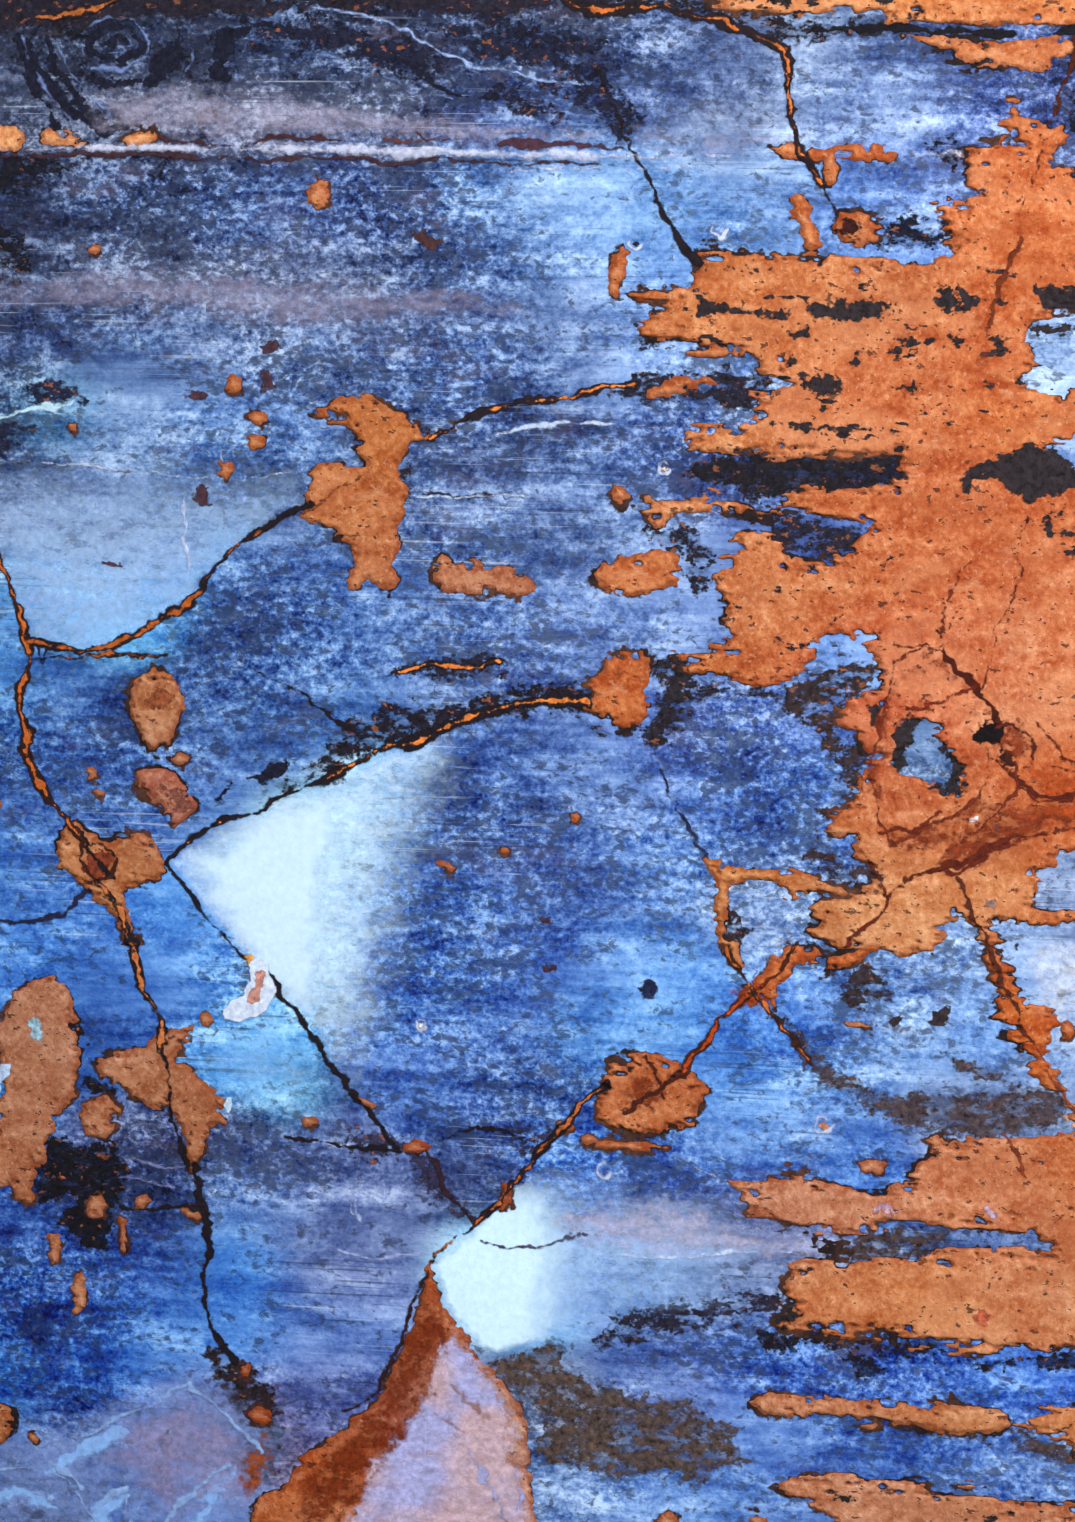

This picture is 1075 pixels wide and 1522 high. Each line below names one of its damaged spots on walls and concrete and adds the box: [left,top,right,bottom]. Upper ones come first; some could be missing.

crack [34,0,120,21]
peeling [700,0,1075,75]
crack [0,67,704,267]
crack [560,0,1075,325]
peeling [299,393,459,598]
crack [428,380,639,441]
peeling [581,95,1075,1360]
crack [0,467,372,1366]
peeling [0,954,276,1208]
crack [165,657,813,1412]
peeling [744,1388,1075,1459]
peeling [767,1471,1075,1522]